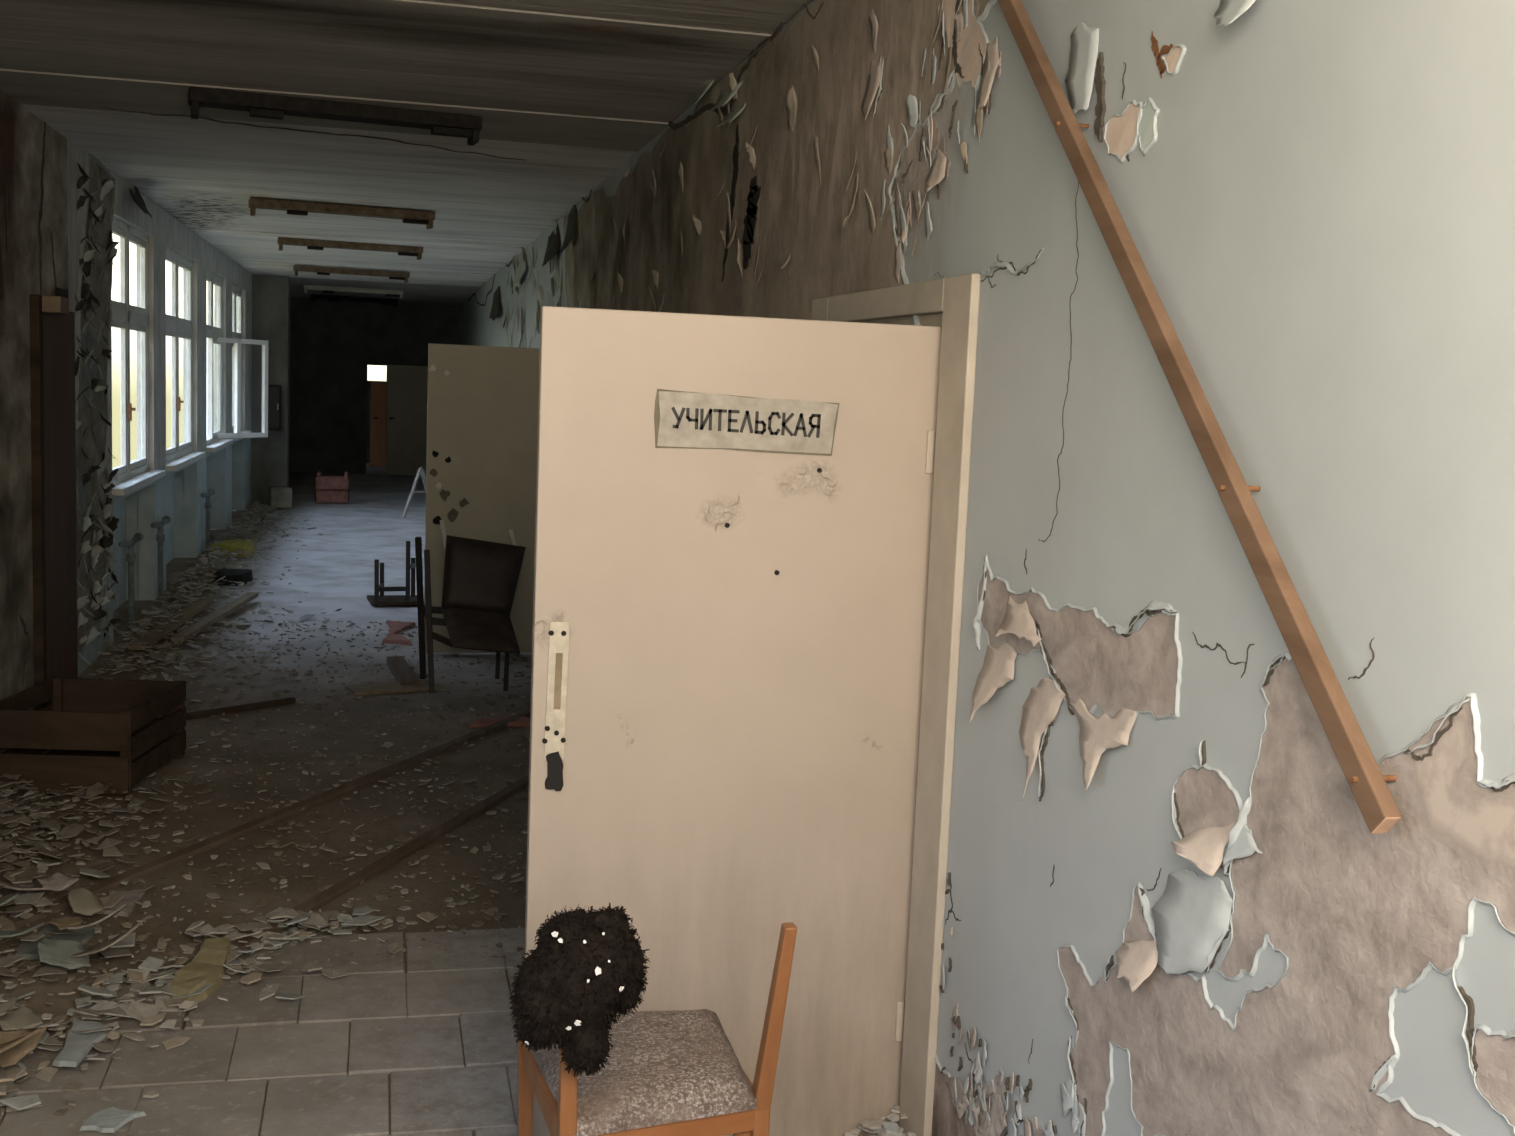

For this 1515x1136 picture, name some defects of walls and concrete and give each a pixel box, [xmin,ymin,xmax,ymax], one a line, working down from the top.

flaking render [489,0,1002,348]
peeling [1065,22,1099,114]
peeling [1104,96,1160,163]
peeling [1162,44,1187,76]
peeling [75,152,152,665]
crack [933,182,1079,575]
peeling [969,554,1183,802]
peeling [931,652,1515,1136]